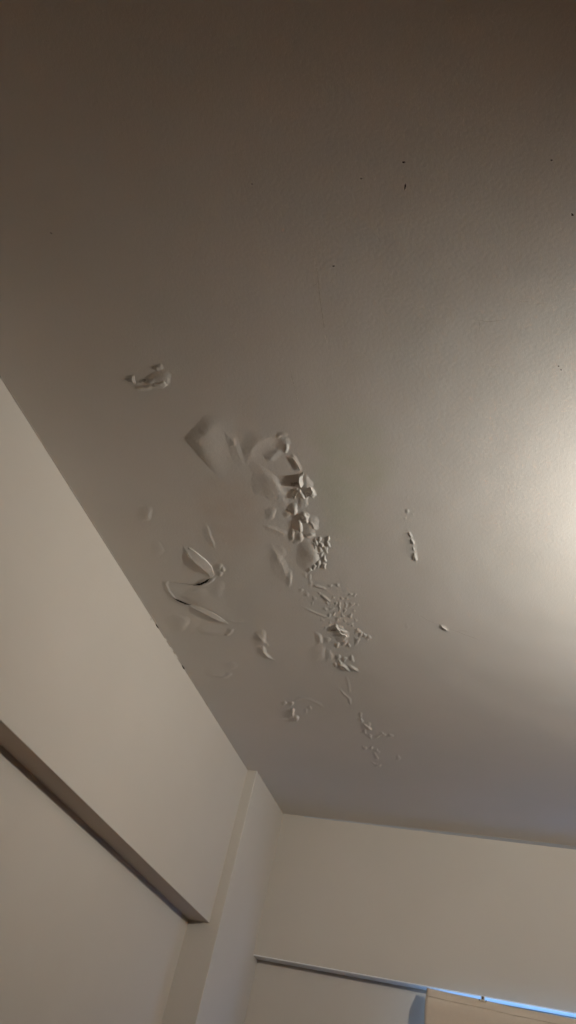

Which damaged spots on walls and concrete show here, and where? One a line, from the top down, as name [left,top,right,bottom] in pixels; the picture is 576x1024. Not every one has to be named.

peeling [288,452,331,573]
peeling [398,496,418,565]
peeling [162,545,231,626]